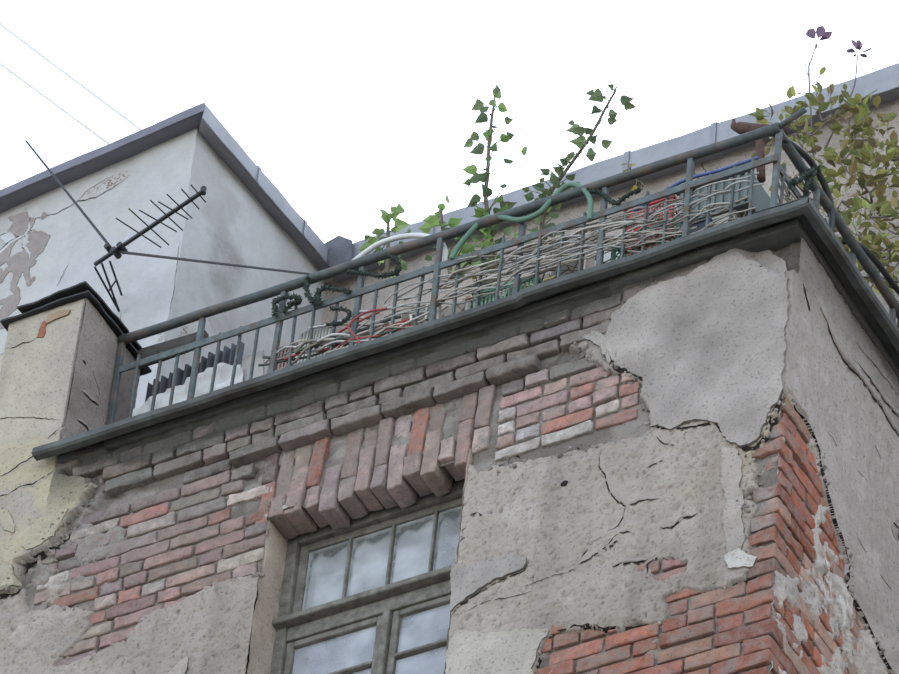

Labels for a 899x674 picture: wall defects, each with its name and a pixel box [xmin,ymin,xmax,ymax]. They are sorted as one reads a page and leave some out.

peeling [0,208,50,329]
crack [0,357,100,439]
flaking render [37,309,71,338]
crack [803,284,899,436]
crack [0,456,55,498]
crack [0,534,71,599]
flaking render [0,463,275,666]
crack [451,447,679,616]
flaking render [445,248,889,674]
crack [660,513,698,529]